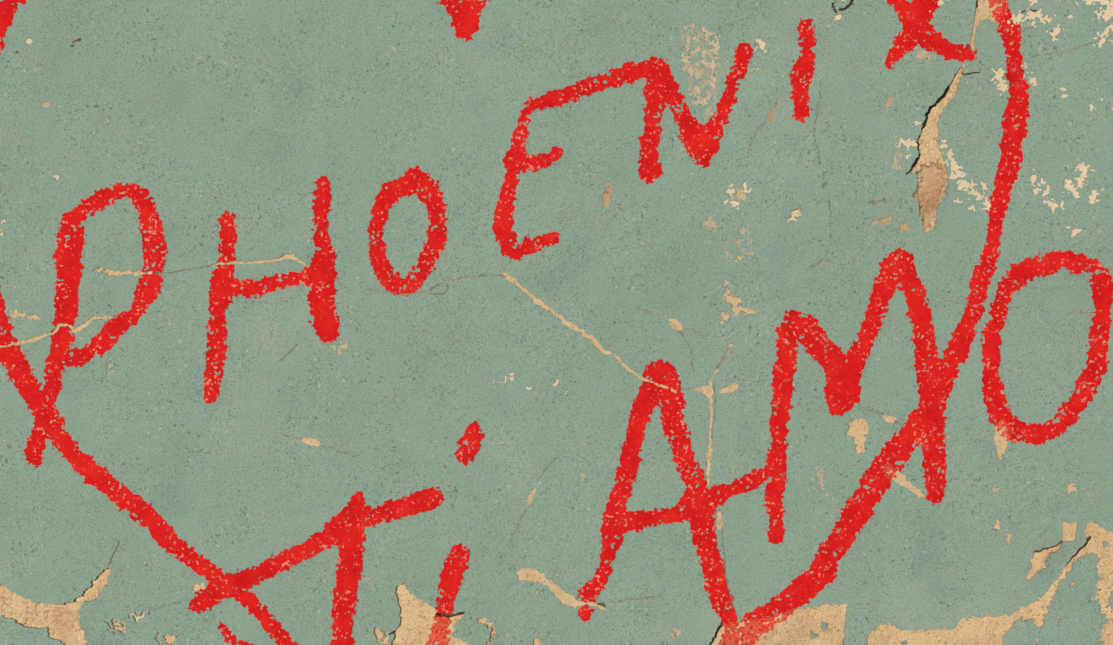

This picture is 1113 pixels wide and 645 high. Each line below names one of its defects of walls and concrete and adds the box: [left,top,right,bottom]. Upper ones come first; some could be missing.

peeling [970,0,1113,51]
spalling [868,62,1008,233]
crack [93,254,308,276]
crack [0,316,111,347]
crack [366,272,738,487]
crack [283,434,364,457]
peeling [0,568,111,645]
peeling [368,583,471,645]
crack [508,455,661,610]
crack [716,512,733,606]
peeling [709,603,847,645]
peeling [866,521,1113,645]